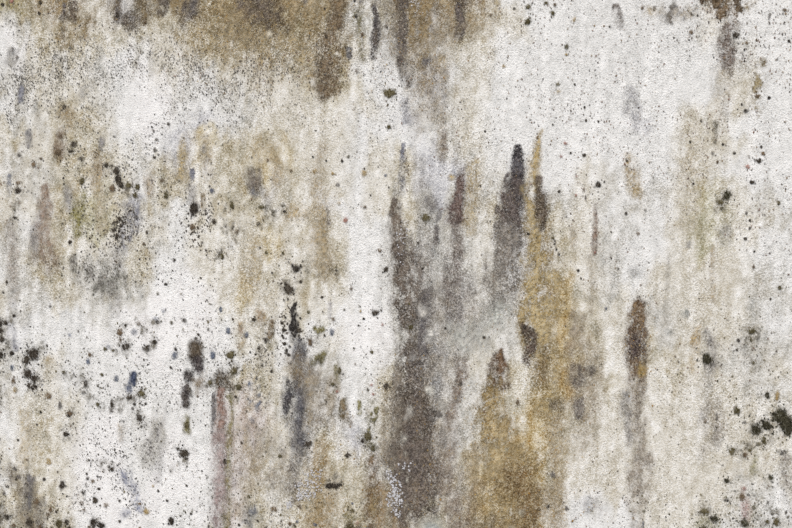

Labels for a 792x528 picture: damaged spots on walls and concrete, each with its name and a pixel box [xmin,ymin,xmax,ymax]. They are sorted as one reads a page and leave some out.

water stain [542,302,602,421]